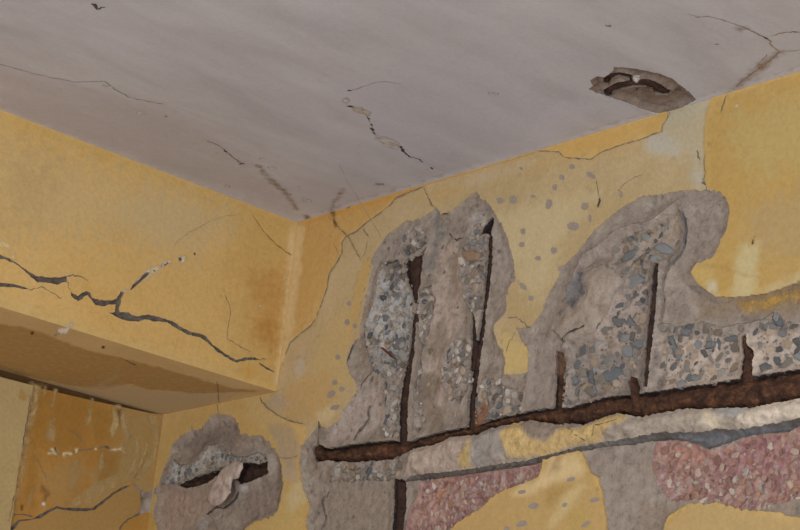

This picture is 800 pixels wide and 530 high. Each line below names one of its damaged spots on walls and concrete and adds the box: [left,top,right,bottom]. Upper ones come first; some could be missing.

crack [343,81,433,170]
rust [604,72,676,96]
crack [690,14,800,111]
crack [328,216,369,257]
crack [0,214,291,372]
spalling [264,67,800,530]
rust [315,225,800,463]
crack [9,485,129,530]
spalling [133,414,284,530]
rust [395,480,407,530]